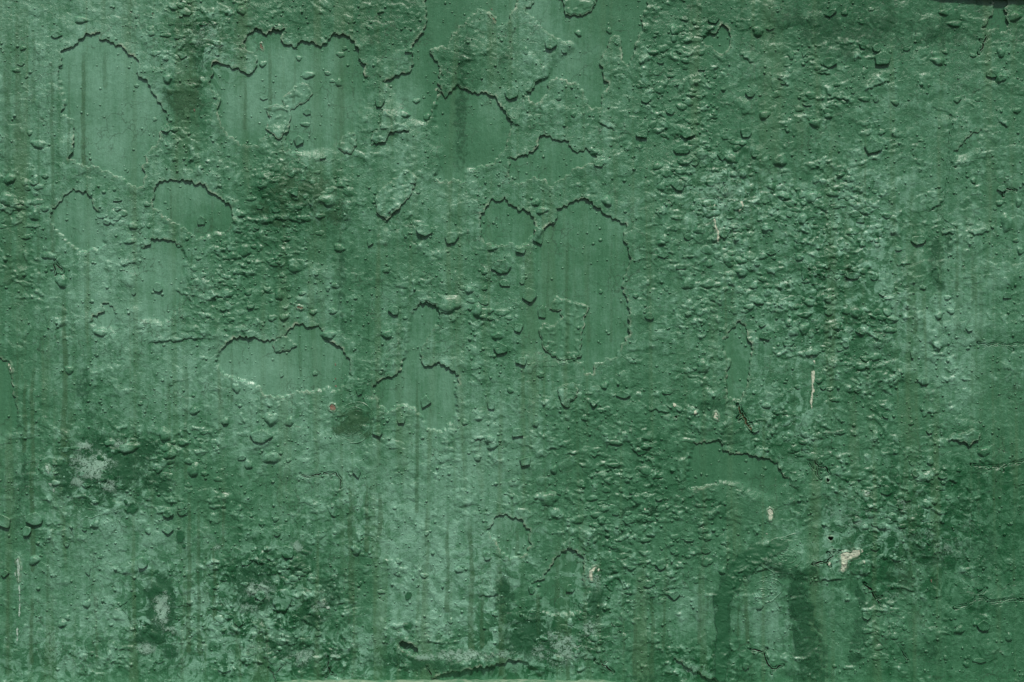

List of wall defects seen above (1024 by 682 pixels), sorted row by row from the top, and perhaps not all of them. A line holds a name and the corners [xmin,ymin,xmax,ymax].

peeling [48,28,238,338]
peeling [204,0,653,413]
peeling [368,300,464,436]
peeling [483,509,536,564]